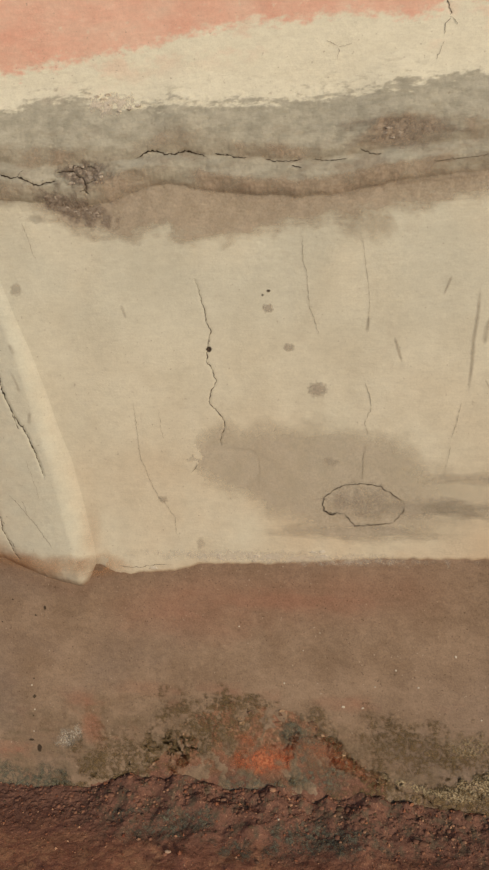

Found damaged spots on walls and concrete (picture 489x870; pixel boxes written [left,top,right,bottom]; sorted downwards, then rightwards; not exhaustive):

crack [0,165,97,194]
crack [137,149,381,168]
water stain [44,163,489,240]
crack [198,288,261,487]
crack [0,378,52,548]
water stain [199,430,443,529]
crack [322,383,404,527]